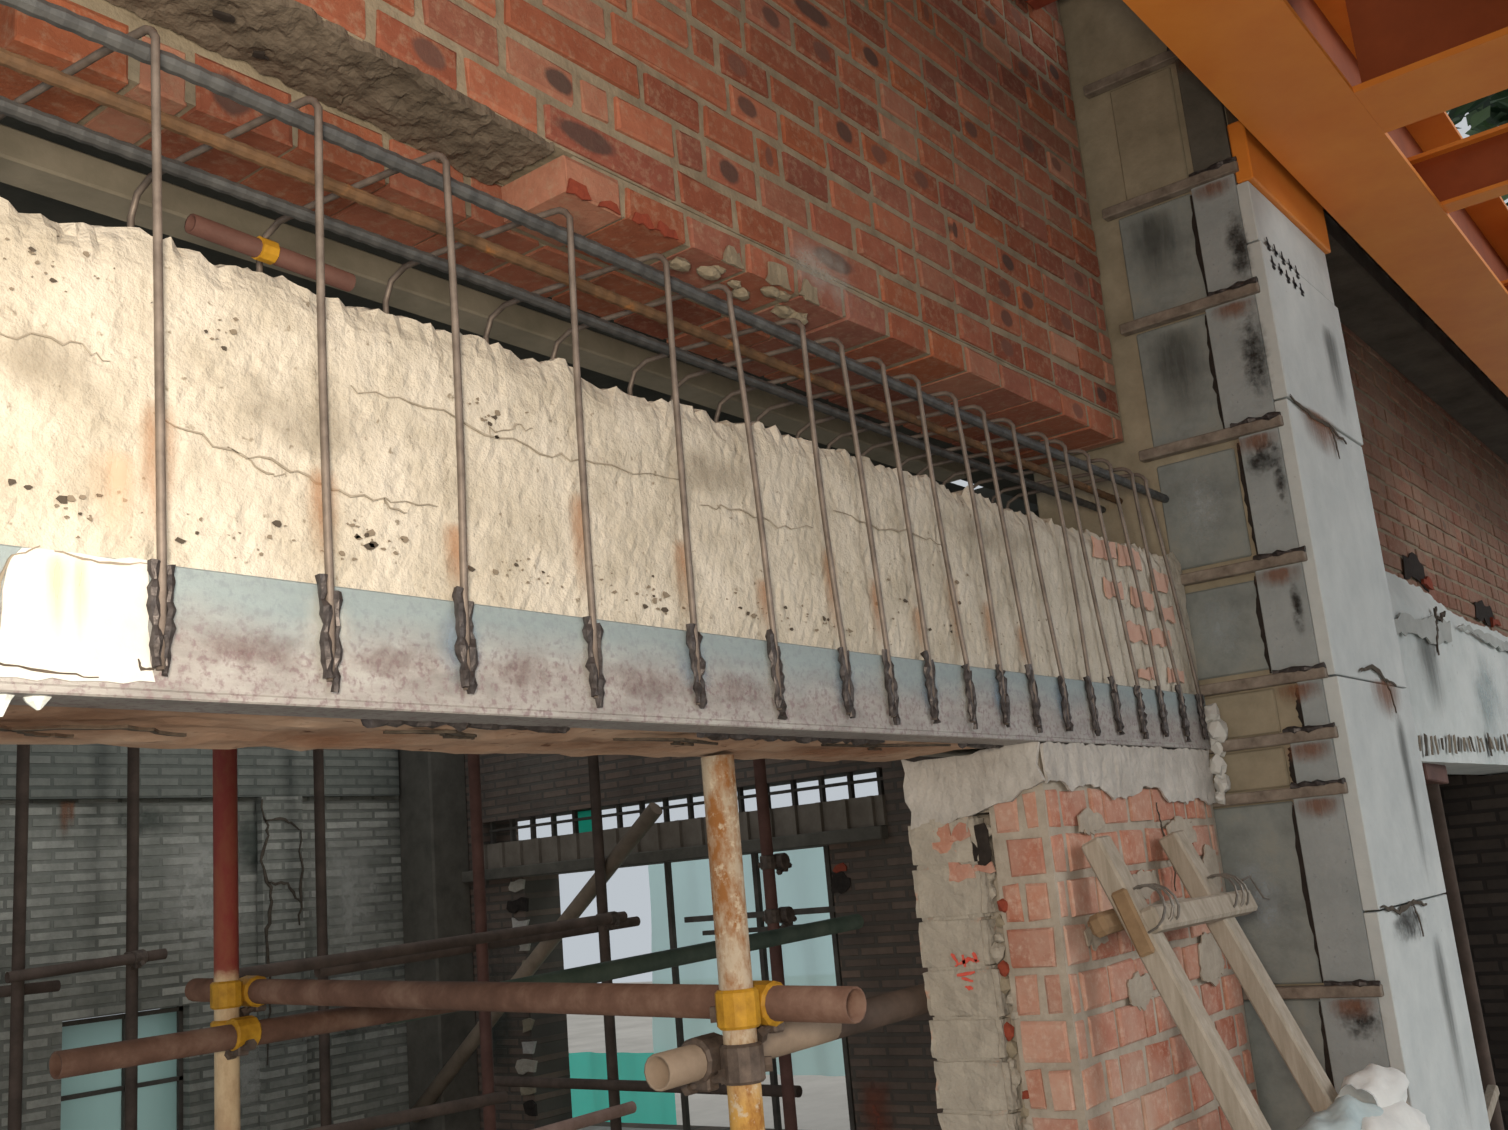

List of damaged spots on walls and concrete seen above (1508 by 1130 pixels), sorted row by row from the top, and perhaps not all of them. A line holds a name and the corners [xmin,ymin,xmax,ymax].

spalling [28,246,67,292]
crack [0,332,110,362]
spalling [204,317,239,351]
spalling [54,490,143,522]
crack [153,412,438,514]
crack [350,385,941,545]
peeling [0,536,155,684]
crack [260,799,304,1065]
spalling [932,822,1034,1130]